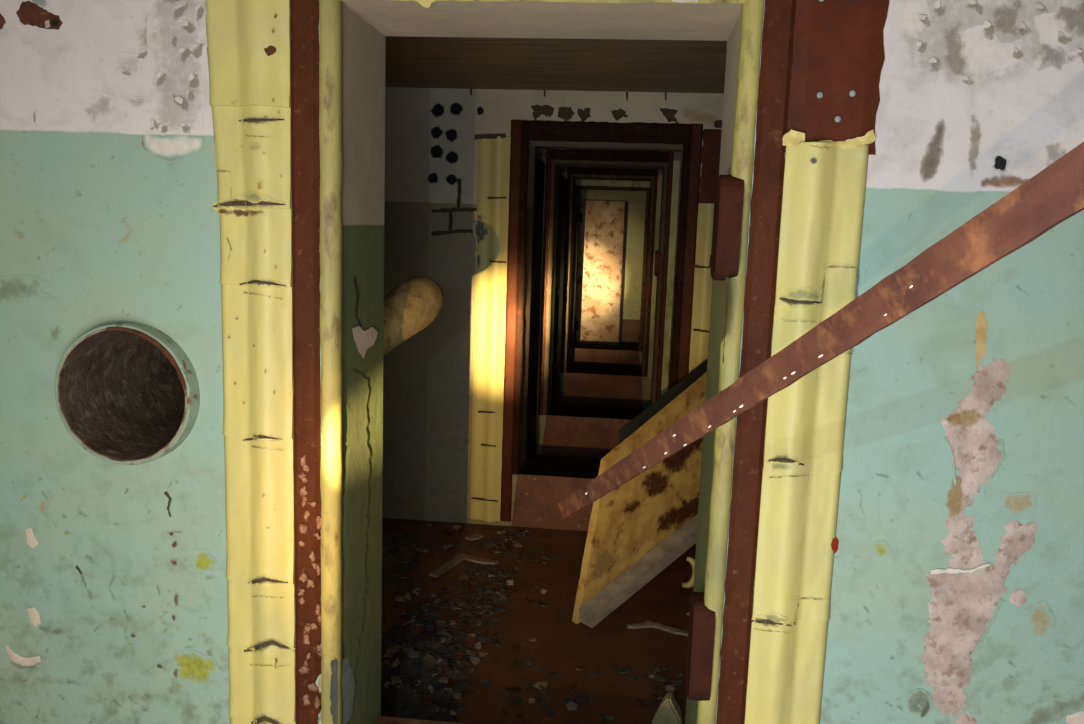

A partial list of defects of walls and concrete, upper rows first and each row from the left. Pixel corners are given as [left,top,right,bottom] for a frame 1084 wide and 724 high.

corrosion [720,277,729,363]
peeling [6,645,41,669]
peeling [297,454,356,724]
peeling [920,311,1038,724]